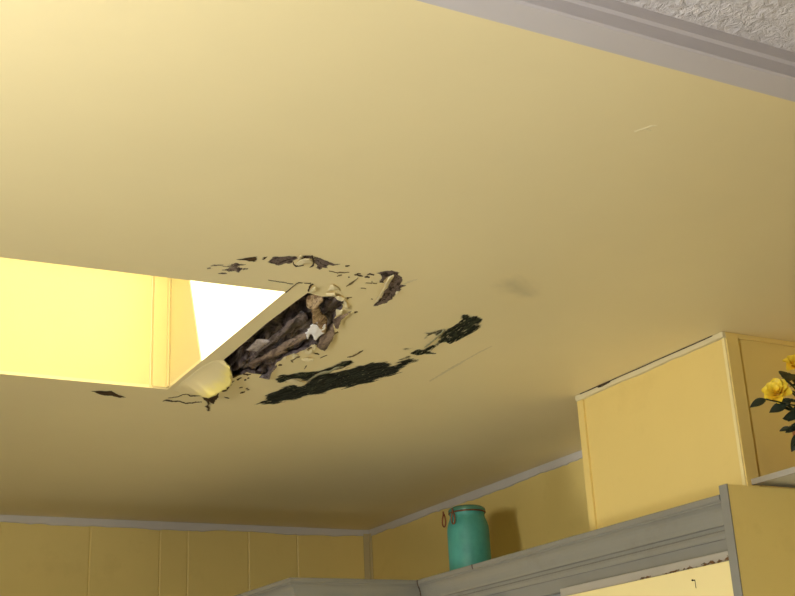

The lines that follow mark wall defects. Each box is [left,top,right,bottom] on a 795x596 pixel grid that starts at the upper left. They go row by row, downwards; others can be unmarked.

spalling [237,255,338,270]
spalling [374,270,406,306]
damp [254,314,482,405]
peeling [174,360,237,411]
crack [164,373,251,404]